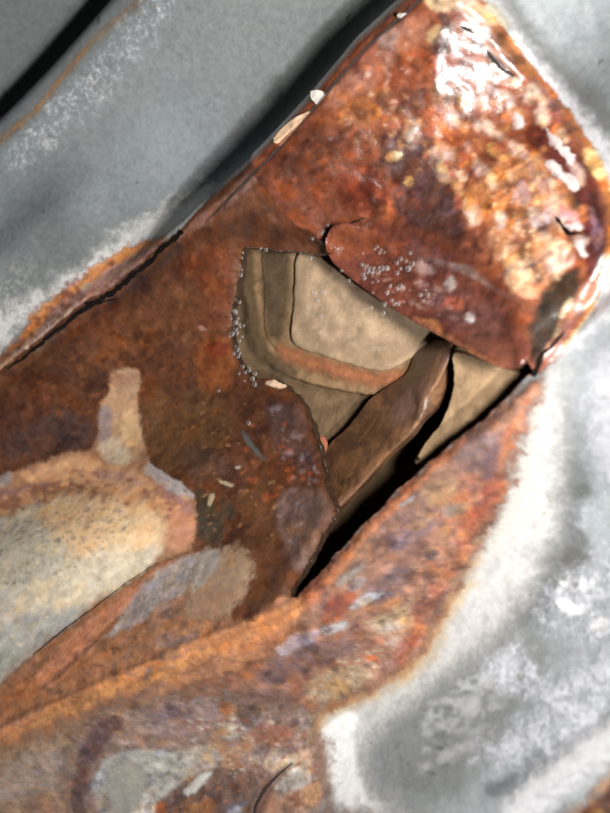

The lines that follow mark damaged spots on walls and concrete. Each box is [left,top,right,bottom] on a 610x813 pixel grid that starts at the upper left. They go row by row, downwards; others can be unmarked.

corrosion [273,111,311,144]
water stain [483,0,610,182]
crack [7,230,184,369]
water stain [0,178,217,354]
water stain [243,250,409,412]
corrosion [0,159,542,813]
water stain [305,280,610,813]
corrosion [569,779,610,813]